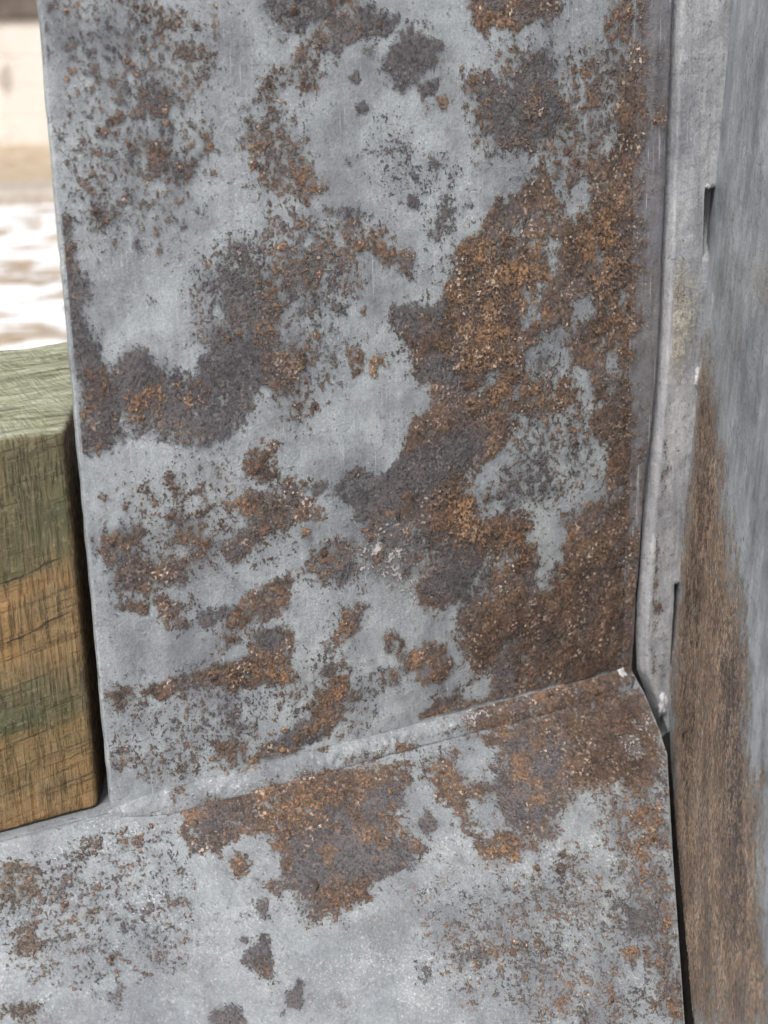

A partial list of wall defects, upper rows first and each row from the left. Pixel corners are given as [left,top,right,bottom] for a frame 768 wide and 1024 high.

corrosion [44,0,232,356]
corrosion [651,328,768,1024]
corrosion [69,957,108,991]